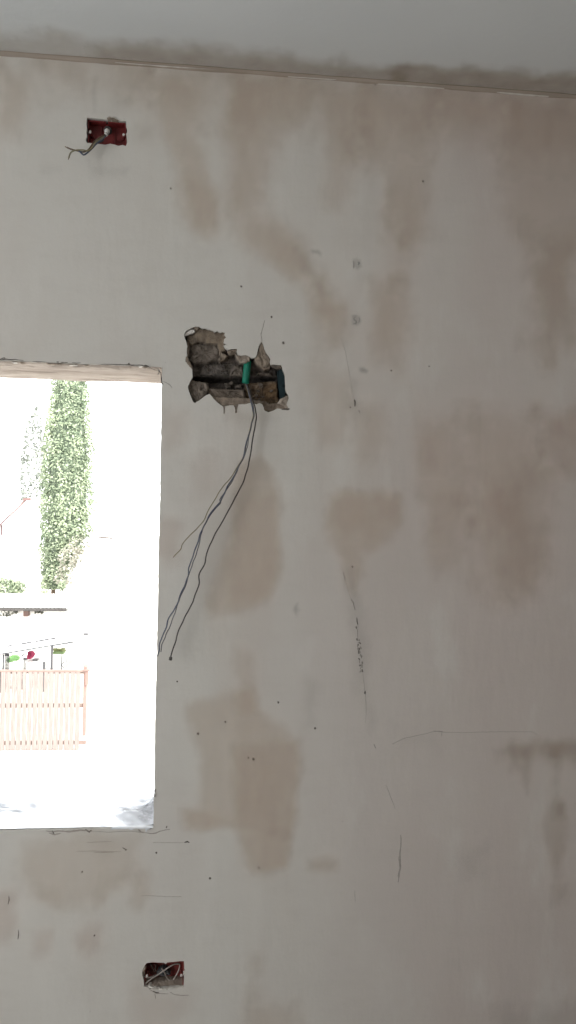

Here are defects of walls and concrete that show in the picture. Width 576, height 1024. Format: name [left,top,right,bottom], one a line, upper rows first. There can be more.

spalling [184,327,290,413]